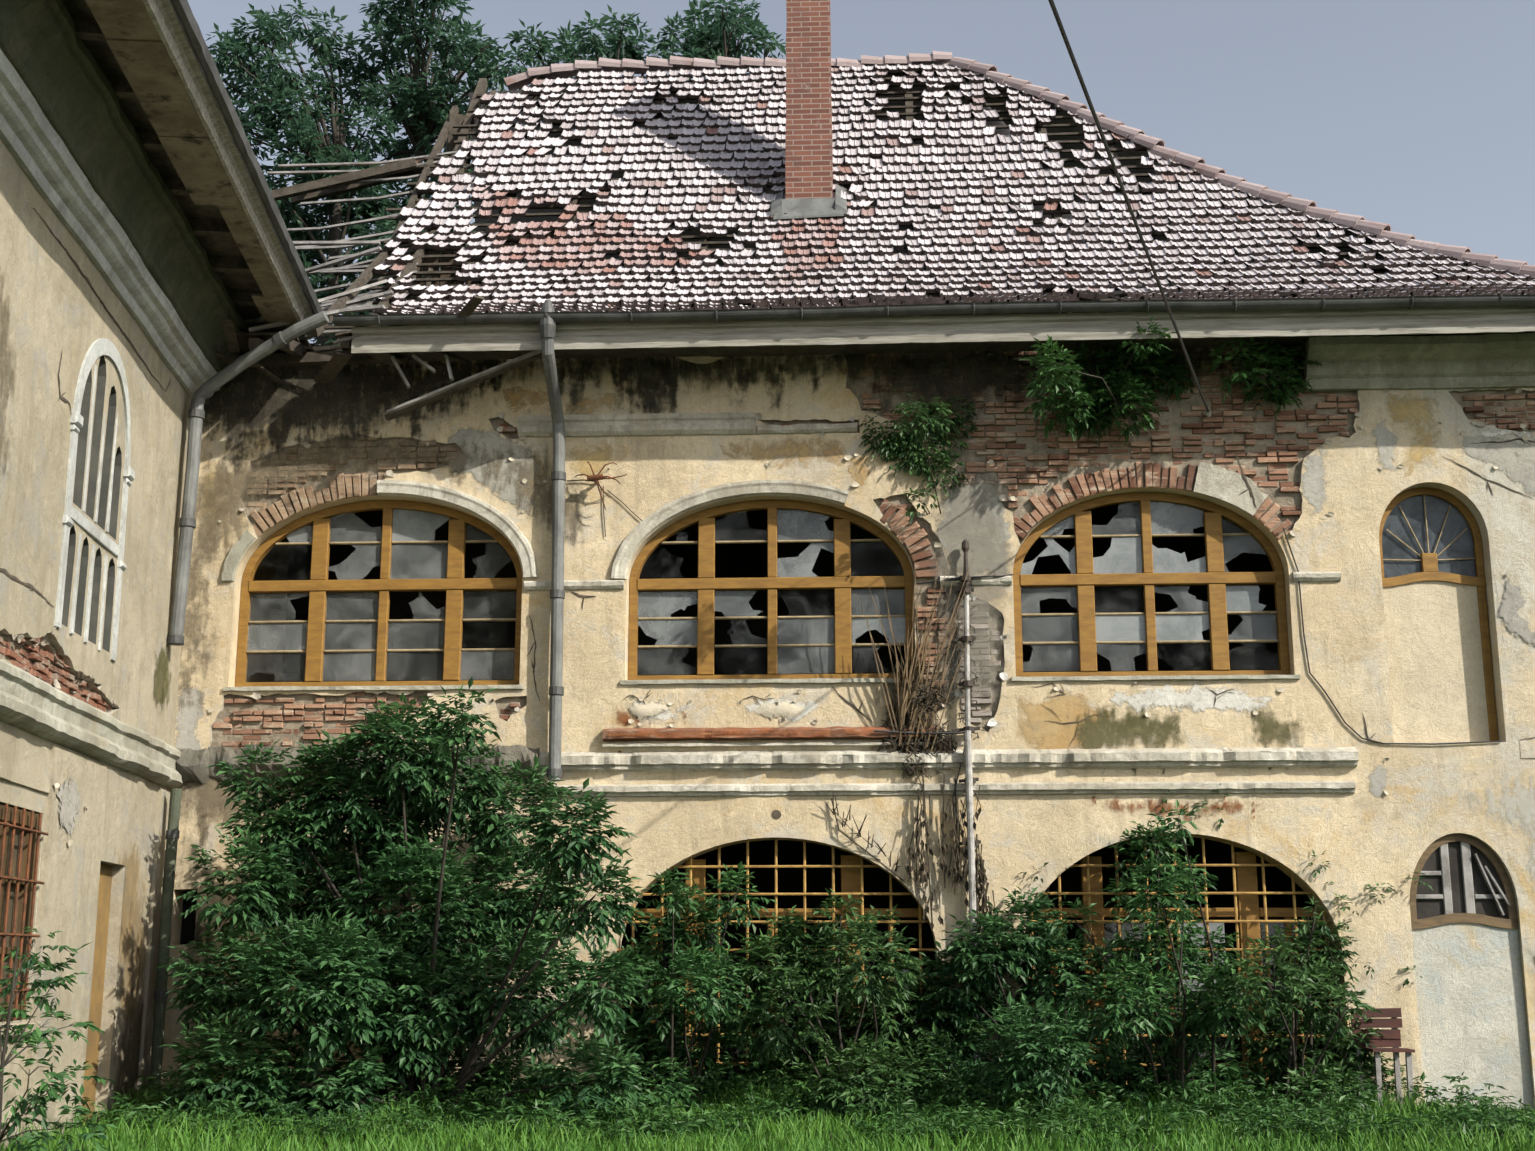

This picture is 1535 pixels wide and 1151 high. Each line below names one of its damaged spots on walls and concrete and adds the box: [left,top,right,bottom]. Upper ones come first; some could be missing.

leakage [0,277,14,466]
leakage [557,369,588,406]
leakage [162,351,581,707]
flaking render [725,346,1535,732]
flaking render [0,626,116,712]
flaking render [175,687,434,750]
peeling [1018,680,1285,750]